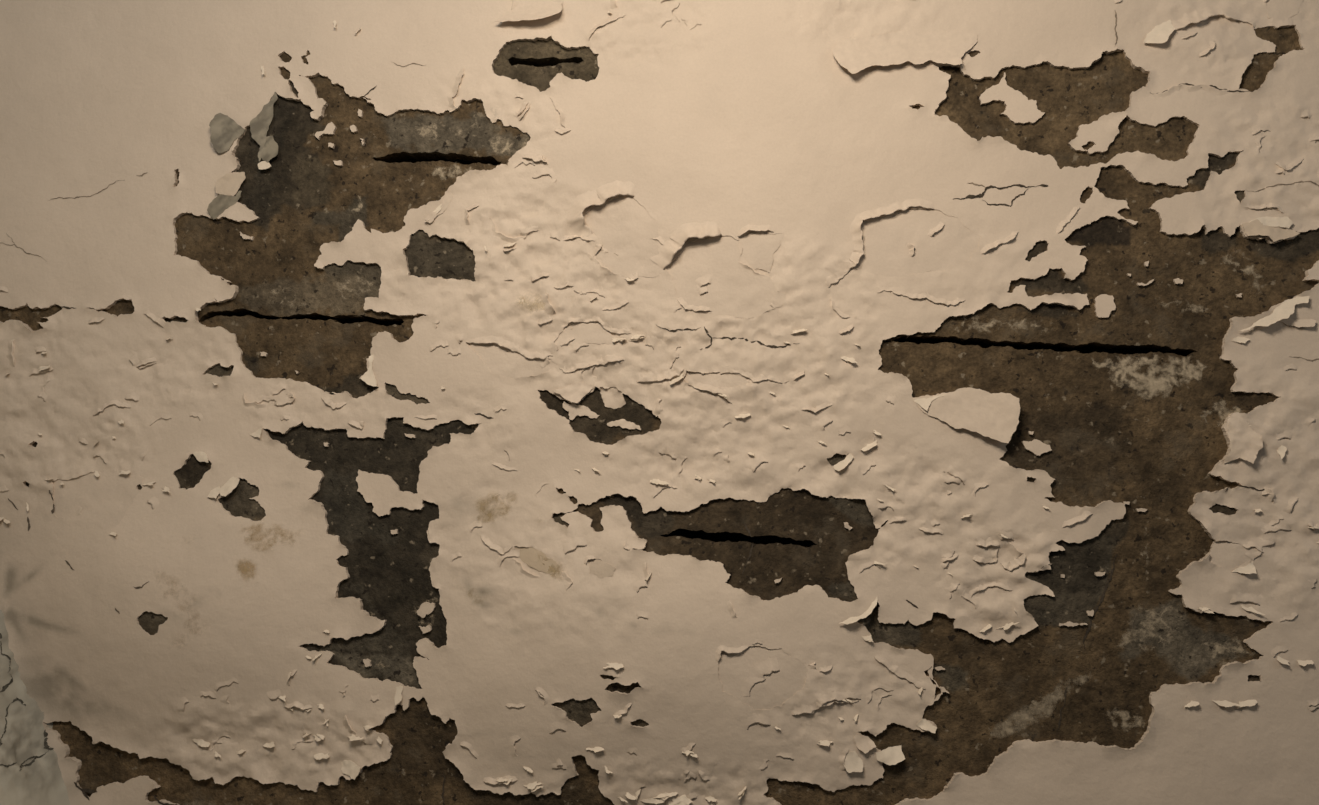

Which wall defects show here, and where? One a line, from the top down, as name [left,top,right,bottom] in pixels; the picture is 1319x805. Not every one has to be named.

crack [394,158,498,166]
crack [222,312,404,326]
peeling [0,286,62,402]
crack [895,339,1187,356]
flaking render [52,0,805,805]
flaking render [467,0,1319,805]
crack [8,490,55,531]
crack [664,528,815,547]
crack [0,633,54,770]